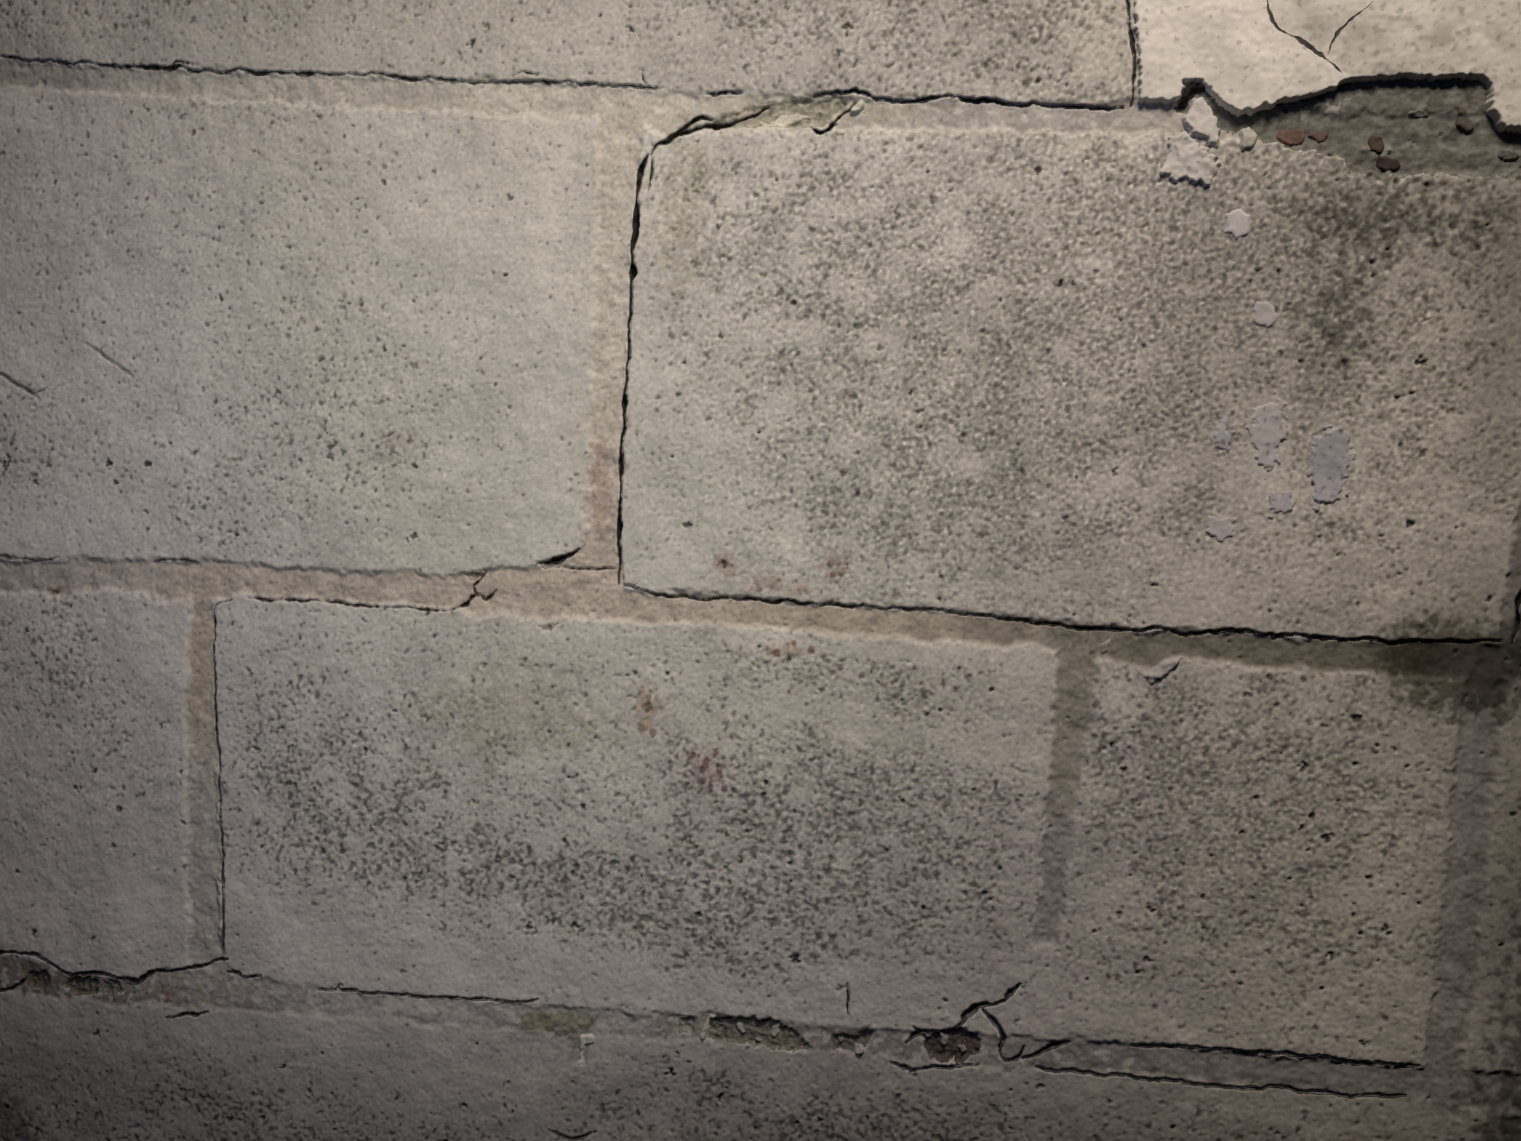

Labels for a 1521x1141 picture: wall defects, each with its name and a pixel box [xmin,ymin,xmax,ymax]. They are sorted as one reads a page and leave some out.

crack [0,56,655,89]
crack [811,0,1137,134]
crack [1267,0,1369,72]
peeling [1132,0,1521,187]
crack [0,373,44,397]
crack [536,91,1521,644]
crack [0,554,56,562]
crack [0,574,496,991]
crack [166,1011,206,1019]
crack [318,989,535,1003]
spalling [923,1024,981,1063]
crack [891,984,1418,1098]